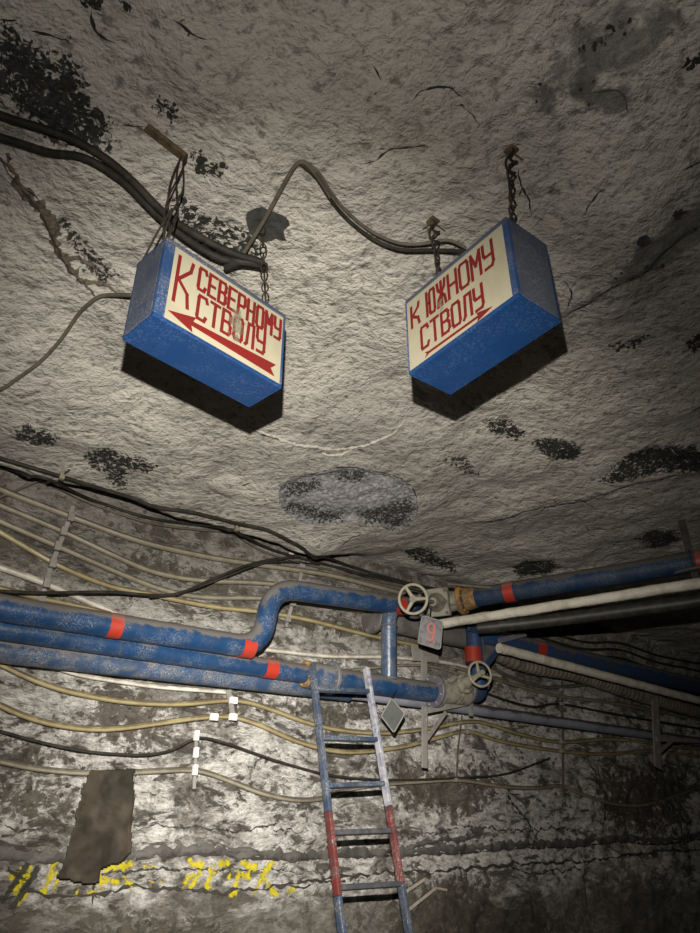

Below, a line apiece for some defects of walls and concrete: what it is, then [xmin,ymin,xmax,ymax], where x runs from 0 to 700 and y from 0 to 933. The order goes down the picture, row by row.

crack [172,19,206,40]
crack [412,86,479,124]
crack [364,145,428,167]
crack [0,778,700,931]